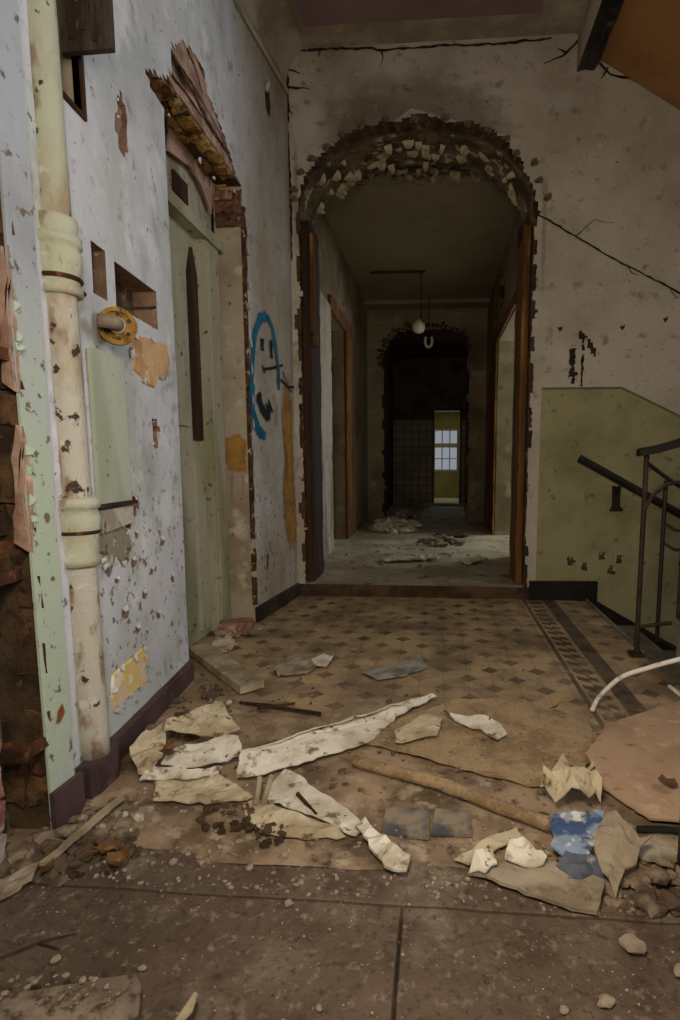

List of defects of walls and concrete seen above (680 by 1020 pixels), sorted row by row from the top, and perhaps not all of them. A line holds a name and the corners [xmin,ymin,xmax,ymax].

crack [599,62,637,83]
crack [287,37,578,261]
crack [533,211,680,299]
peeling [130,335,170,388]
flaking render [289,114,552,587]
flaking render [0,195,51,829]
peeling [99,525,139,583]
peeling [122,605,141,634]
peeling [110,644,152,713]